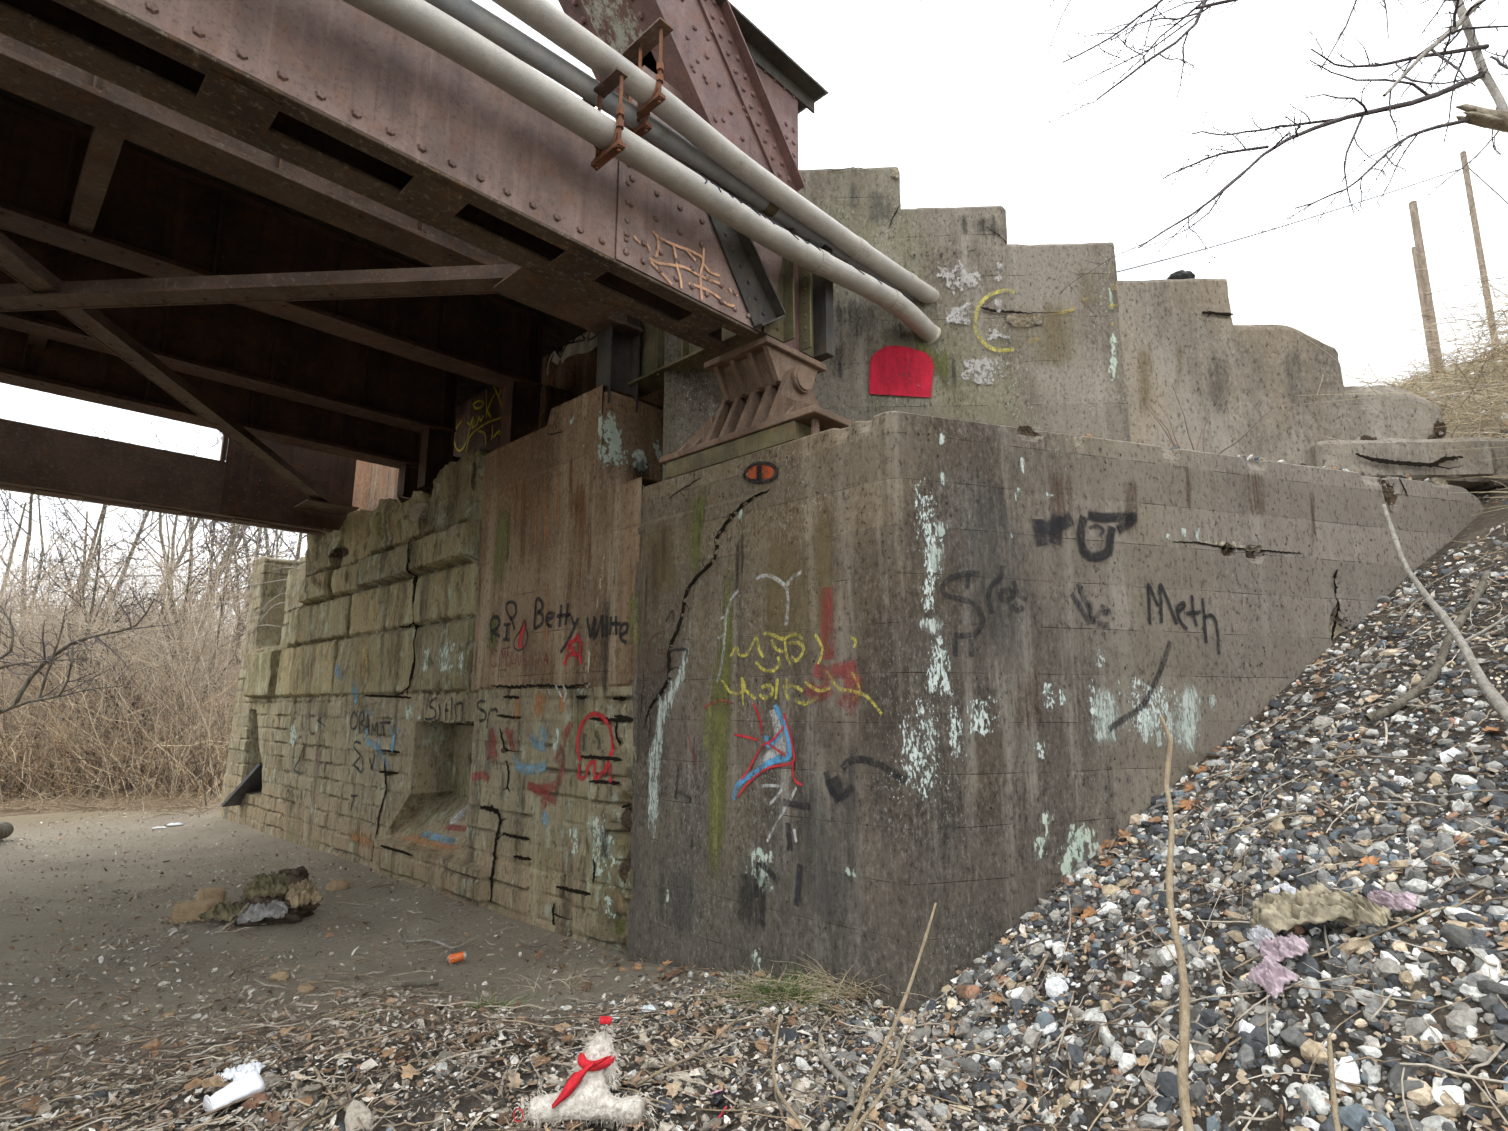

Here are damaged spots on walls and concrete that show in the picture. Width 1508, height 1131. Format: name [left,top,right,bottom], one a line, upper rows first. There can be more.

crack [491,679,589,689]
crack [640,489,770,734]
leakage [887,472,1001,802]
crack [371,761,398,861]
crack [480,729,519,902]